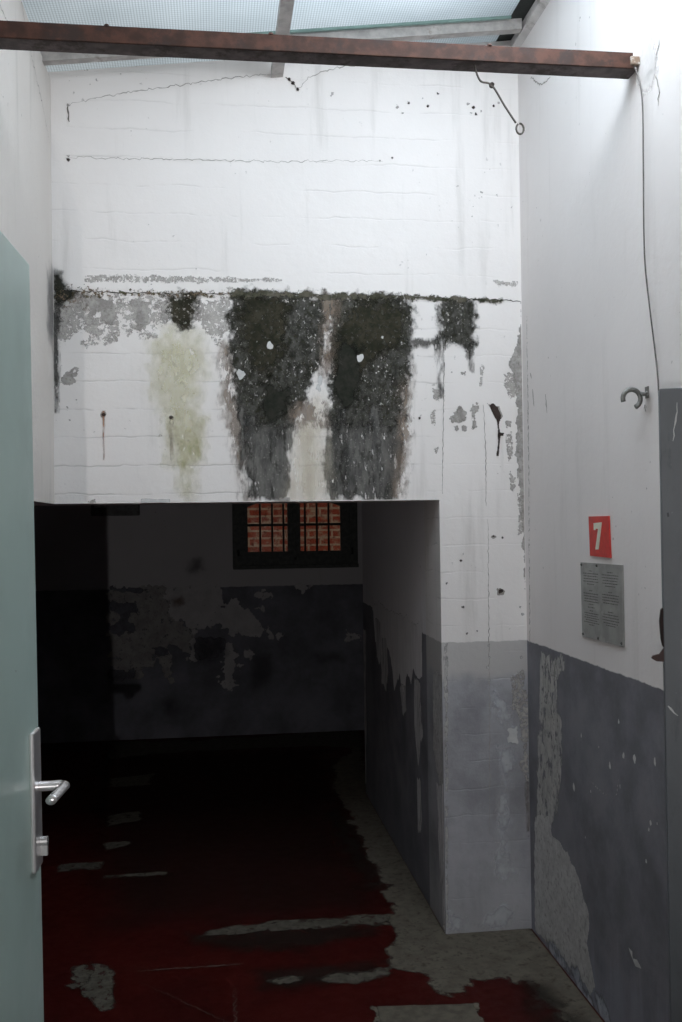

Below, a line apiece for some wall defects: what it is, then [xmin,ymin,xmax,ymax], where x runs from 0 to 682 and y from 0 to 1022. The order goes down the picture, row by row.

crack [31,56,355,137]
crack [66,155,393,163]
water stain [221,288,479,500]
peeling [162,583,283,691]
peeling [205,598,611,1022]
peeling [57,861,168,877]
peeling [66,964,116,1011]